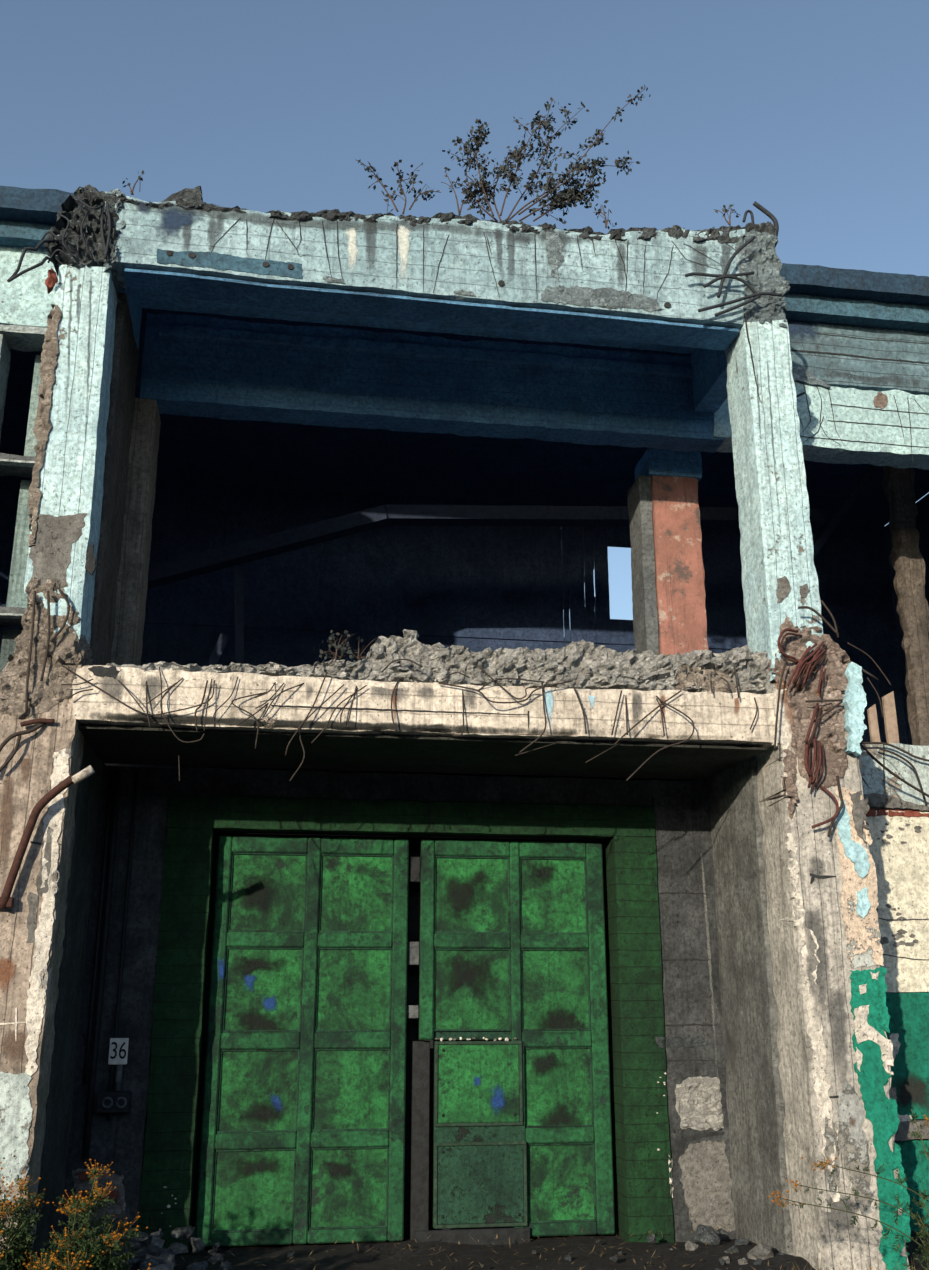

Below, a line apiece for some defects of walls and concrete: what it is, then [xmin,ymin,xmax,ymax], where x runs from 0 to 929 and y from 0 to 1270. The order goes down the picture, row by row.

spalling [7,189,119,282]
damp [161,208,194,235]
damp [346,229,357,263]
damp [398,226,410,267]
spalling [685,201,783,320]
crack [790,322,929,363]
crack [799,384,929,461]
spalling [0,304,305,781]
spalling [585,665,758,781]
peeling [0,748,72,1200]
peeling [760,576,929,1270]
peeling [657,1072,735,1232]